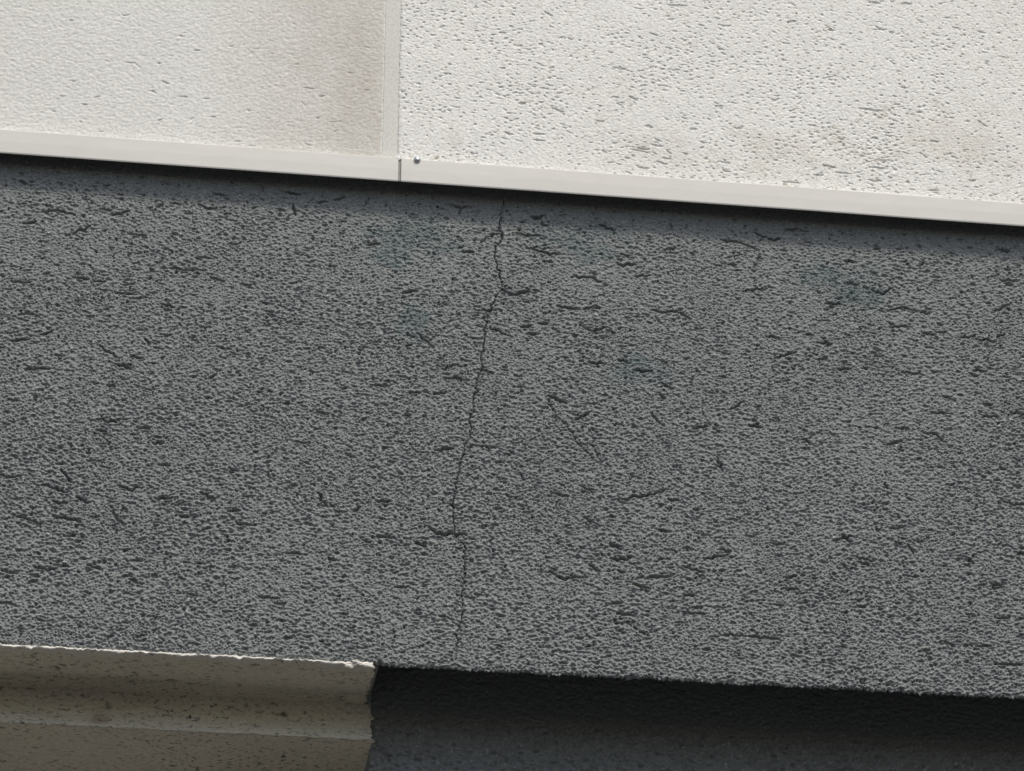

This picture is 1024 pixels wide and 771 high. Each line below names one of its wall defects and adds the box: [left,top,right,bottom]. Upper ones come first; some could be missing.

crack [431,201,507,659]